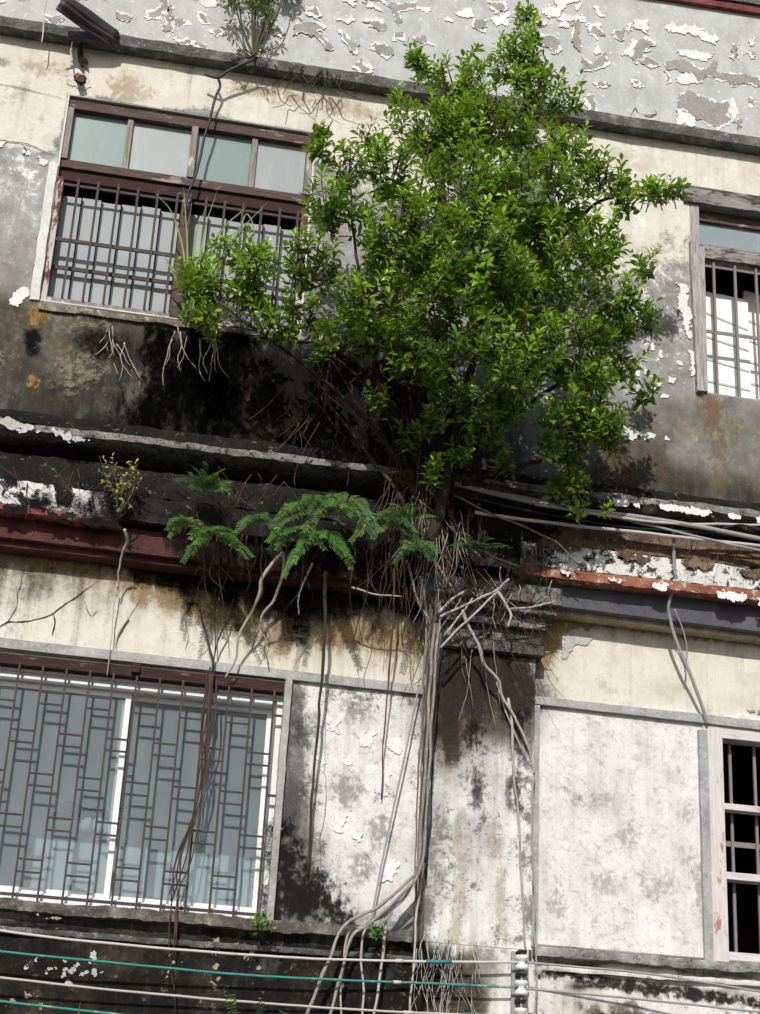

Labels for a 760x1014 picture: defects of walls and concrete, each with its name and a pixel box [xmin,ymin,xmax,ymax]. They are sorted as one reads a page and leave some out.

peeling [536,0,760,131]
leakage [24,329,41,355]
peeling [675,282,695,376]
leakage [46,316,438,461]
flaking render [0,416,90,443]
flaking render [612,497,760,532]
leakage [110,516,567,654]
peeling [716,589,760,606]
leakage [258,689,355,925]
peeling [45,950,103,986]
leakage [442,955,482,1014]
leakage [538,970,760,1014]